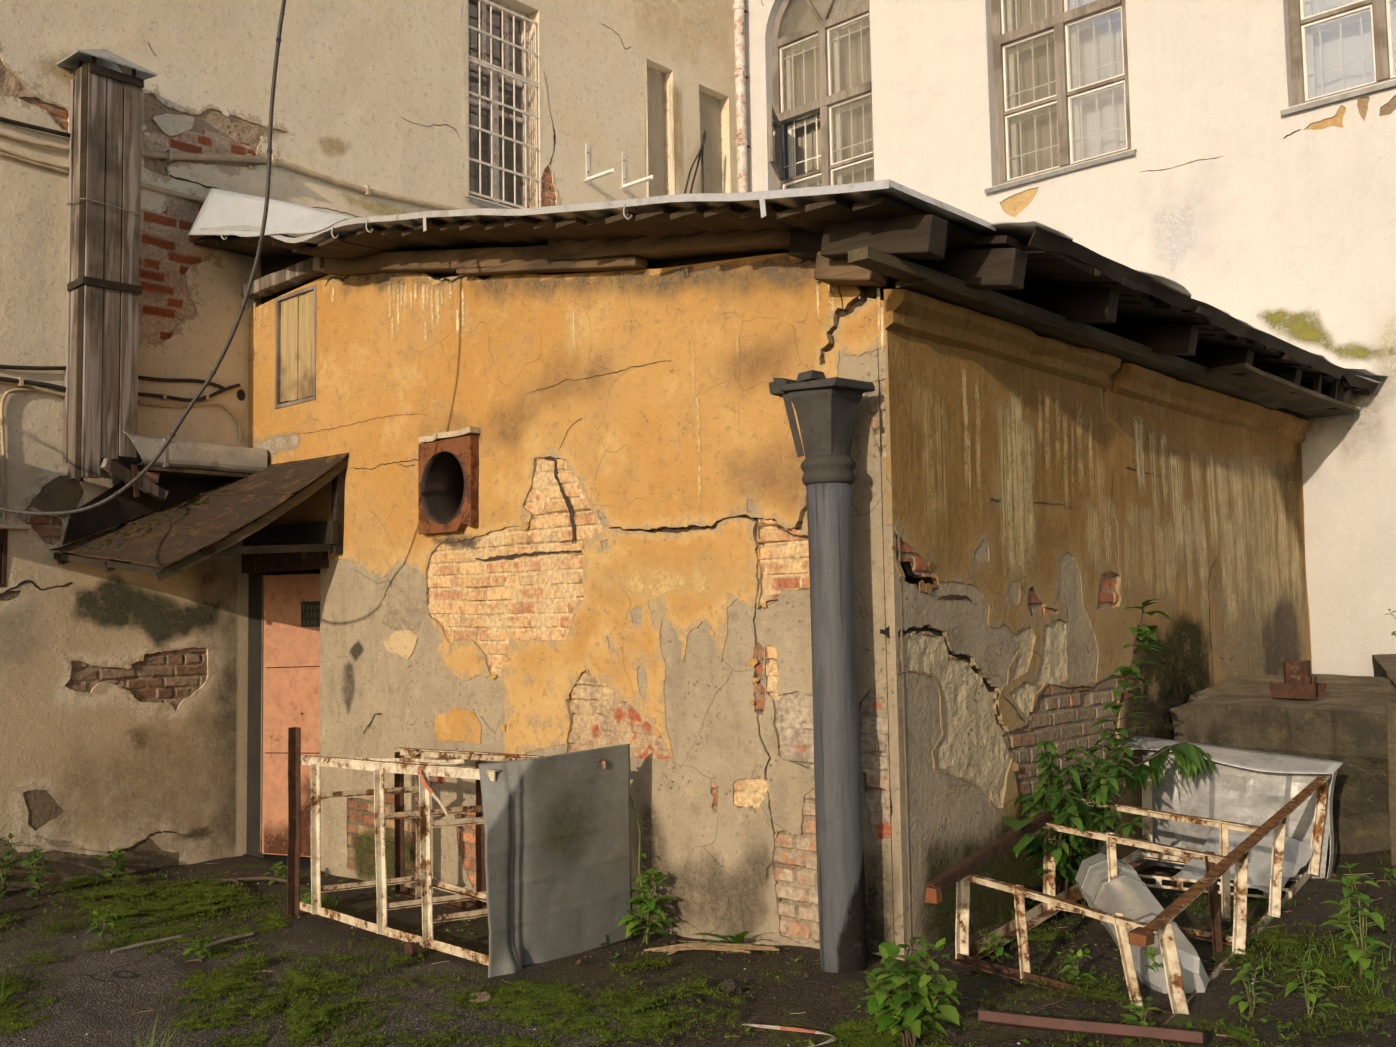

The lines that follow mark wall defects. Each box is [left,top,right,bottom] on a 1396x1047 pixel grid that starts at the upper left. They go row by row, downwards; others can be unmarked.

peeling [142,94,287,176]
flaking render [139,199,219,345]
crack [798,260,881,364]
crack [5,580,72,592]
flaking render [65,647,208,710]
peeling [319,456,612,903]
peeling [524,499,820,949]
crack [614,509,808,545]
damp [922,386,947,537]
damp [962,370,981,490]
peeling [838,346,1140,961]
damp [998,393,1304,761]